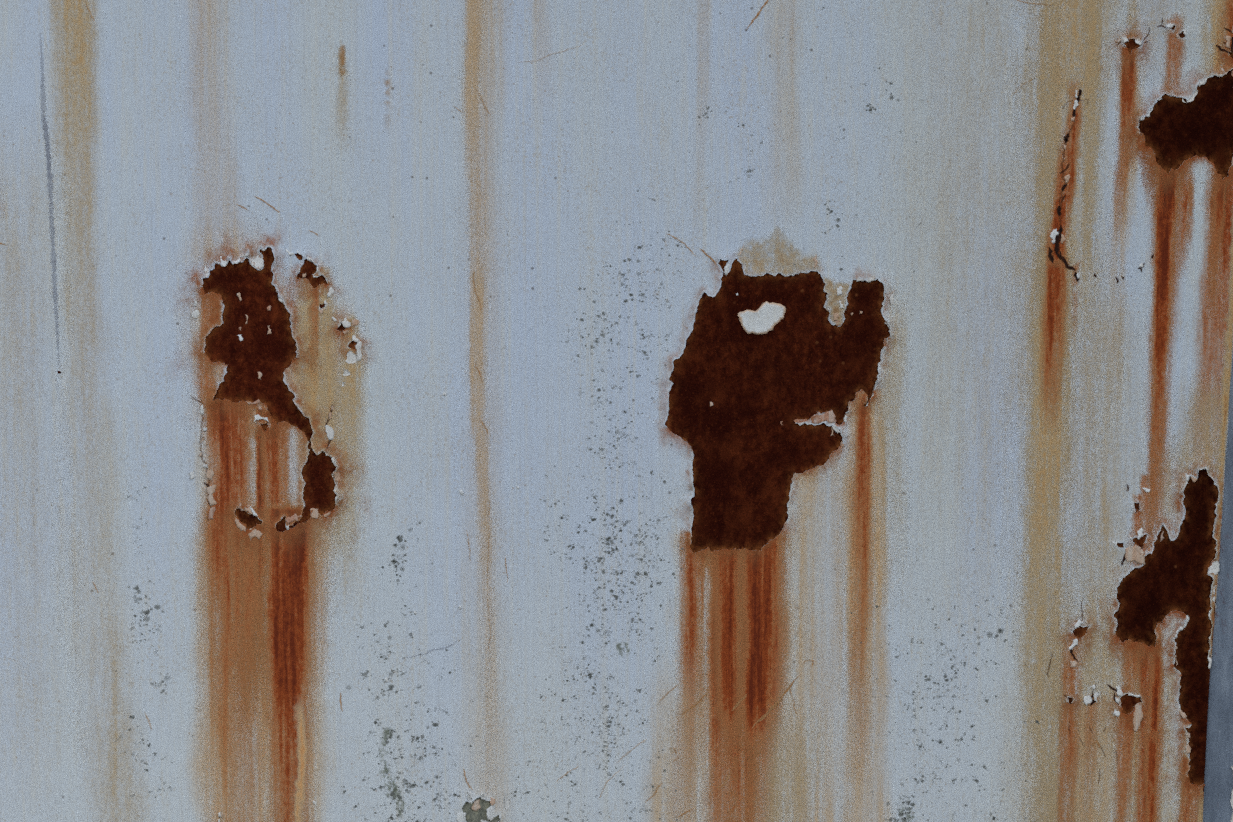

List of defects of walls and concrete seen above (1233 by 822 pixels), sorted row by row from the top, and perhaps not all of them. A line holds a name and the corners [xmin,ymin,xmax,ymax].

peeling [1115,18,1187,60]
peeling [1126,52,1233,185]
peeling [191,238,363,543]
corrosion [197,268,363,822]
peeling [456,792,510,822]
corrosion [681,466,818,822]
peeling [665,229,894,555]
corrosion [845,391,885,822]
peeling [1069,602,1090,668]
corrosion [1026,0,1204,822]
peeling [1107,468,1223,796]
corrosion [1196,166,1233,654]